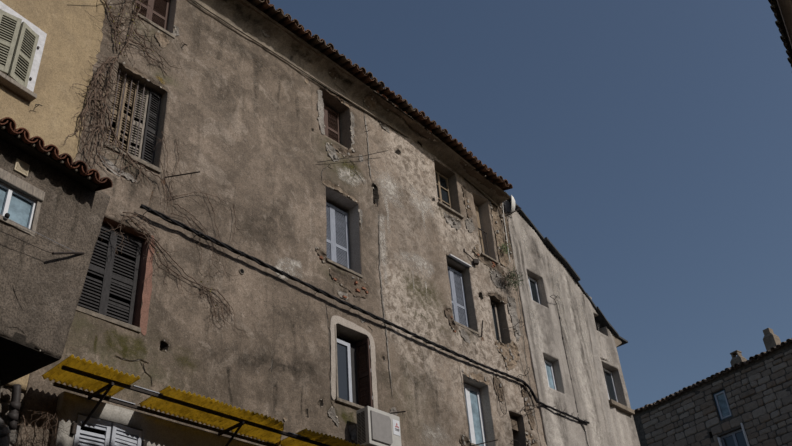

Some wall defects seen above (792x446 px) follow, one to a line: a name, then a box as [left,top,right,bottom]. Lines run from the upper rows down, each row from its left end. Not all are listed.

spalling [317,88,363,162]
spalling [444,307,458,333]
spalling [473,201,522,370]
spalling [462,370,504,404]